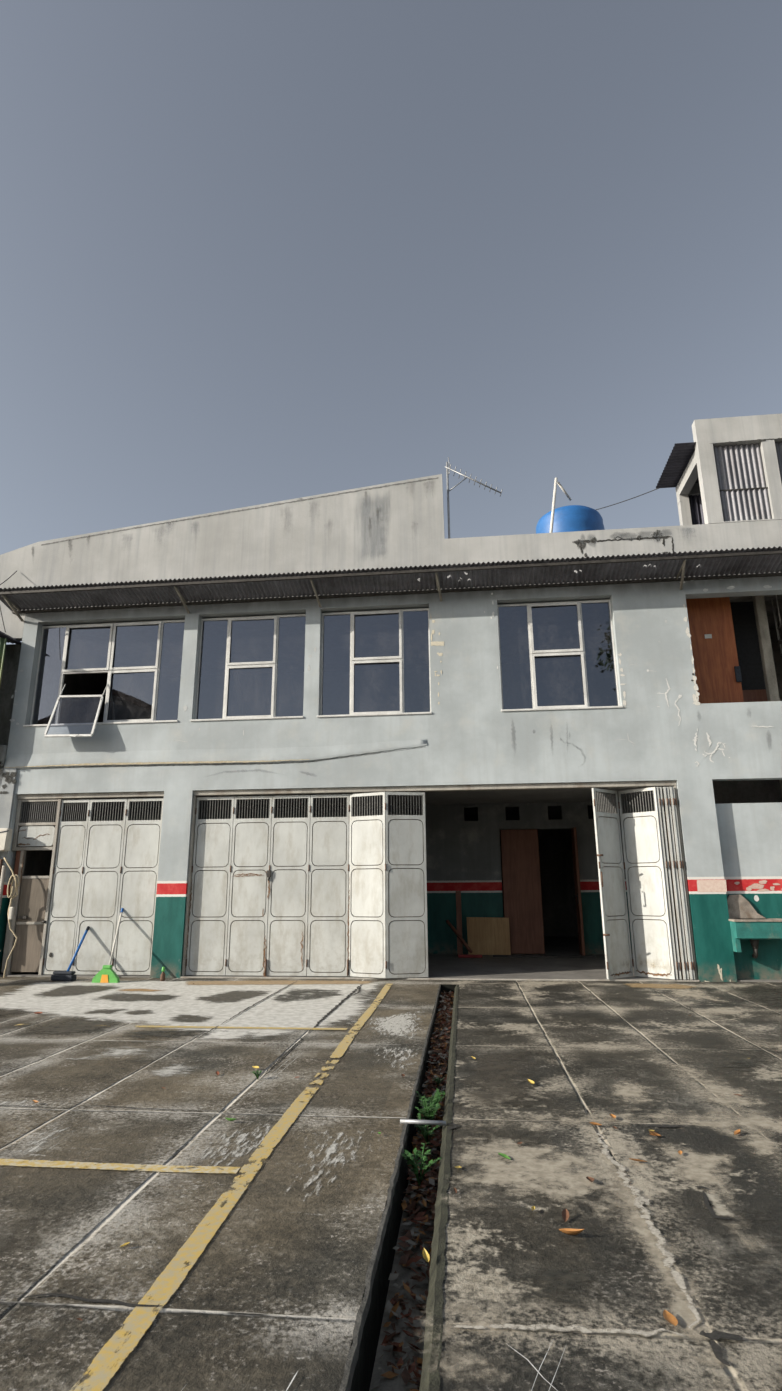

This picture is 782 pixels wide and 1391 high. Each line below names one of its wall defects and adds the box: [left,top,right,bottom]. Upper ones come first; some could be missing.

crack [629,620,730,767]
peeling [697,880,780,901]